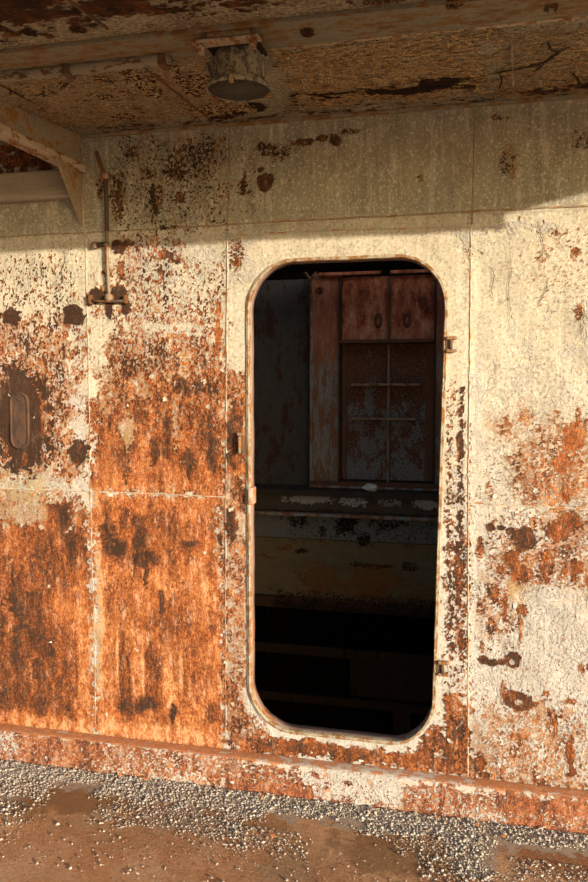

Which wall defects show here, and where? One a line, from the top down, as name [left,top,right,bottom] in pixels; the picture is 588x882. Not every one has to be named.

rust [0,23,588,133]
crack [370,41,580,95]
rust [0,128,588,791]
rust [0,731,588,834]